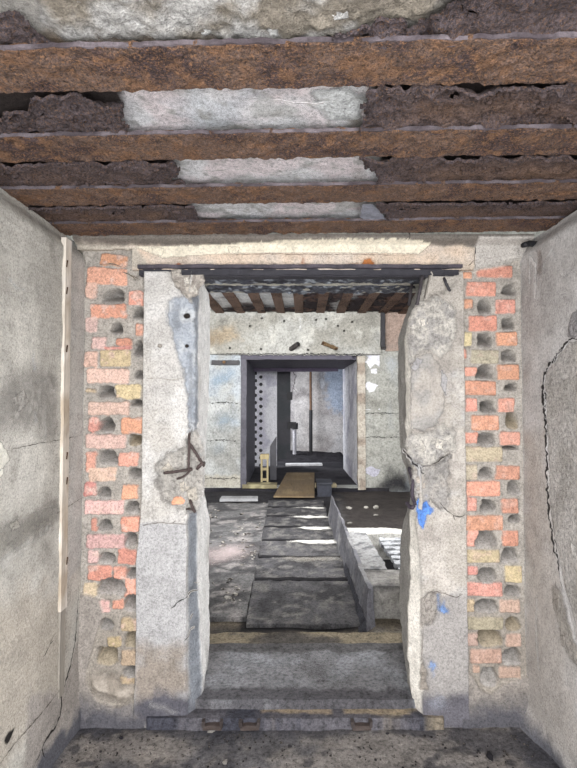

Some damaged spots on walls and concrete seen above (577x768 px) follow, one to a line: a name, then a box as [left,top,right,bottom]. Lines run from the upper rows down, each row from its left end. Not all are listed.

rust [0,91,130,134]
rust [359,82,577,136]
rust [0,160,186,191]
rust [359,154,577,189]
rust [28,204,199,223]
rust [376,200,577,221]
spalling [171,269,205,298]
spalling [405,275,457,510]
spalling [155,429,206,513]
crack [540,337,577,589]